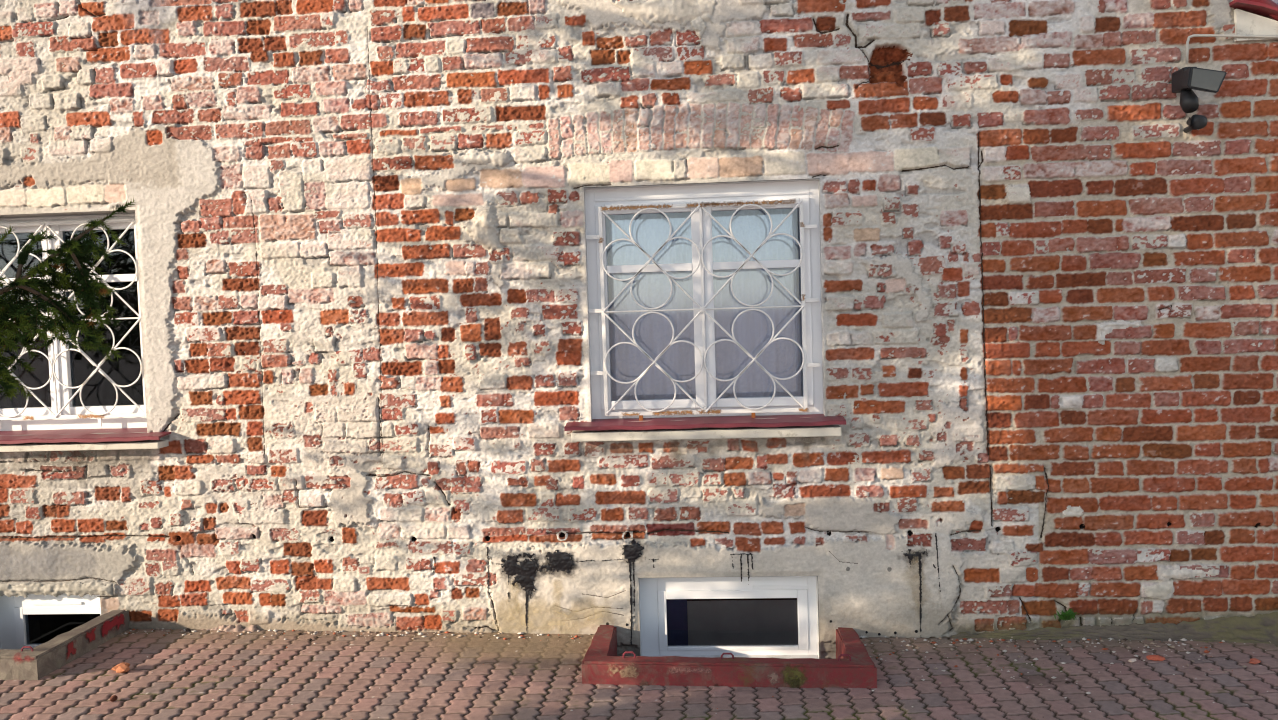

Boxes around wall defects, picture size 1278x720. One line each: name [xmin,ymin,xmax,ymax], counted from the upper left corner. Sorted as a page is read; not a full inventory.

crack [813,14,875,87]
spalling [868,46,913,87]
crack [902,132,993,536]
crack [1040,467,1049,538]
crack [939,566,961,630]